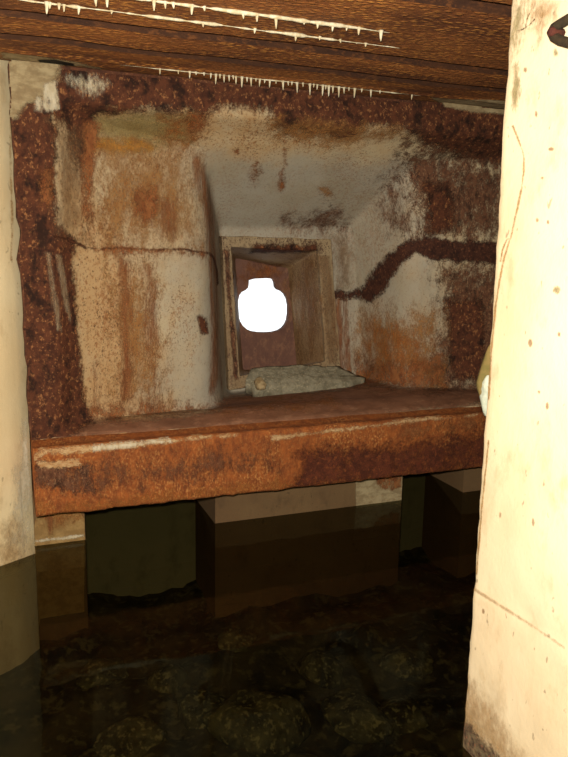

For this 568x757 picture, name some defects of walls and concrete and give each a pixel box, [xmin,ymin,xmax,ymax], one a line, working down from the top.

crack [54,235,219,285]
corrosion [9,69,504,440]
corrosion [295,416,485,487]
corrosion [35,445,256,532]
damp [465,700,505,754]